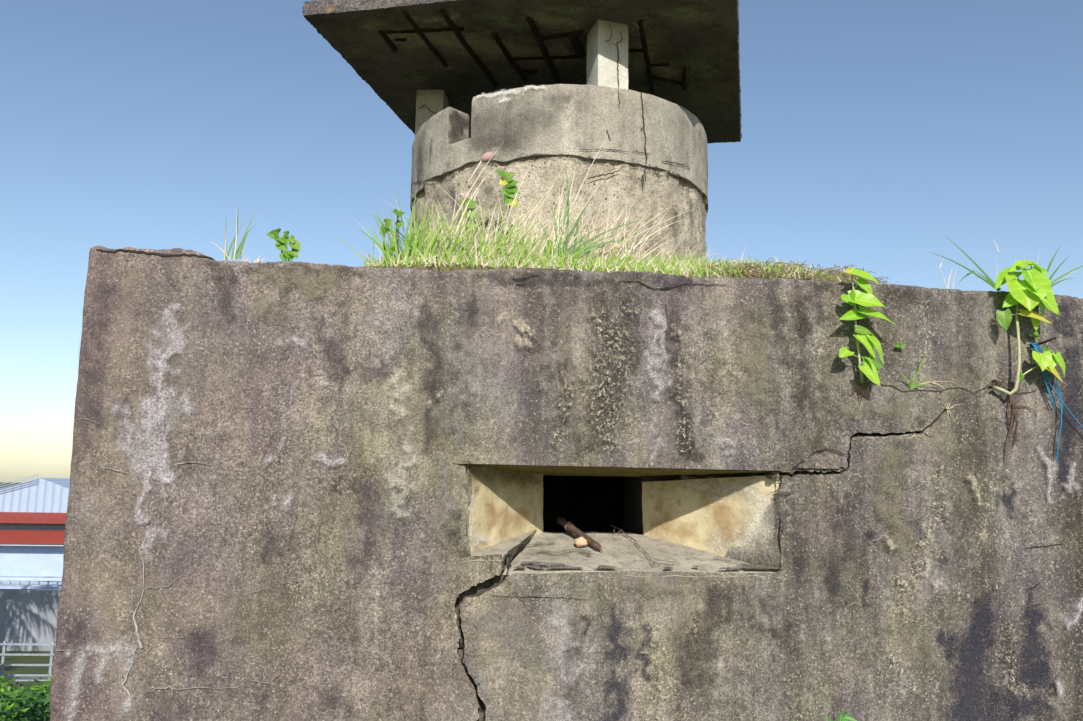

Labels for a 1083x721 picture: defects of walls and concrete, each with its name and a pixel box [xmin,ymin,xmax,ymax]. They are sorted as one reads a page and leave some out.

crack [580,24,706,195]
damp [112,304,193,553]
damp [477,272,610,418]
damp [578,294,703,458]
crack [764,382,1049,478]
damp [66,644,134,721]
crack [453,554,579,721]
damp [937,593,1063,721]
damp [1067,598,1083,628]